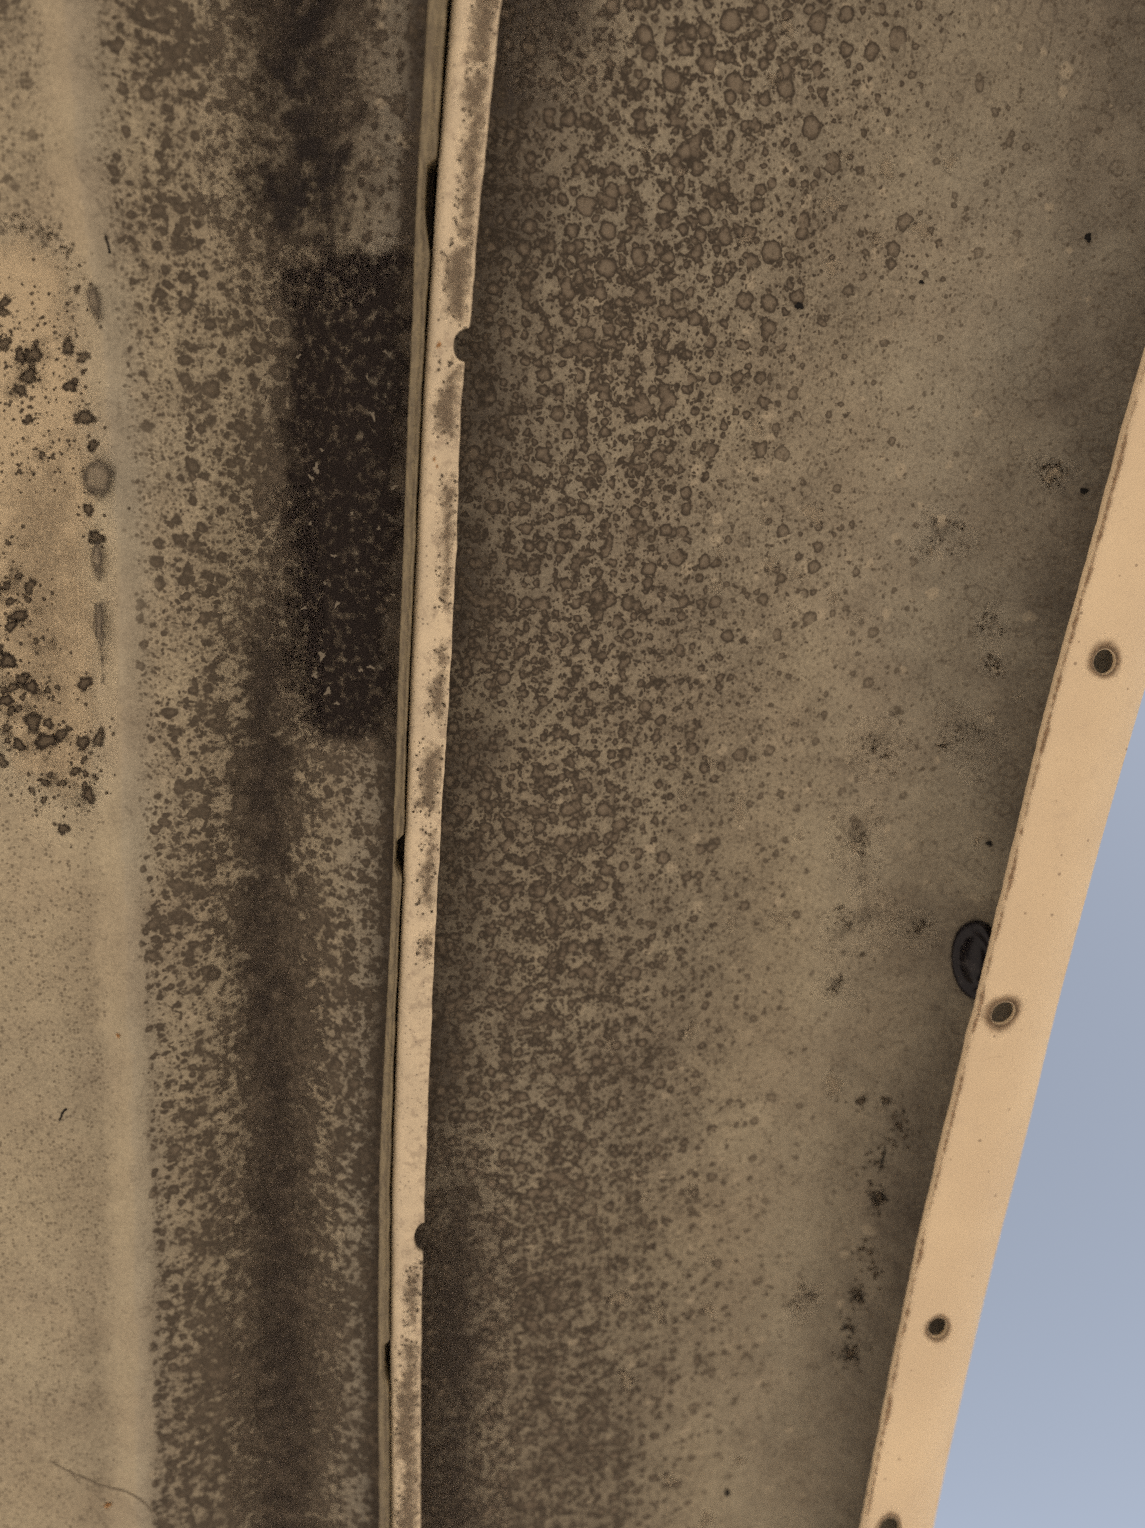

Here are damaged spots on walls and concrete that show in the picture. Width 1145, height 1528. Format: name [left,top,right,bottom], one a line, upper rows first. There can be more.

water stain [437,0,499,329]
water stain [0,244,116,864]
water stain [245,0,413,862]
water stain [433,474,457,609]
water stain [432,355,462,444]
water stain [412,639,450,968]
water stain [836,1081,920,1216]
water stain [394,1261,422,1528]
water stain [829,1236,884,1374]